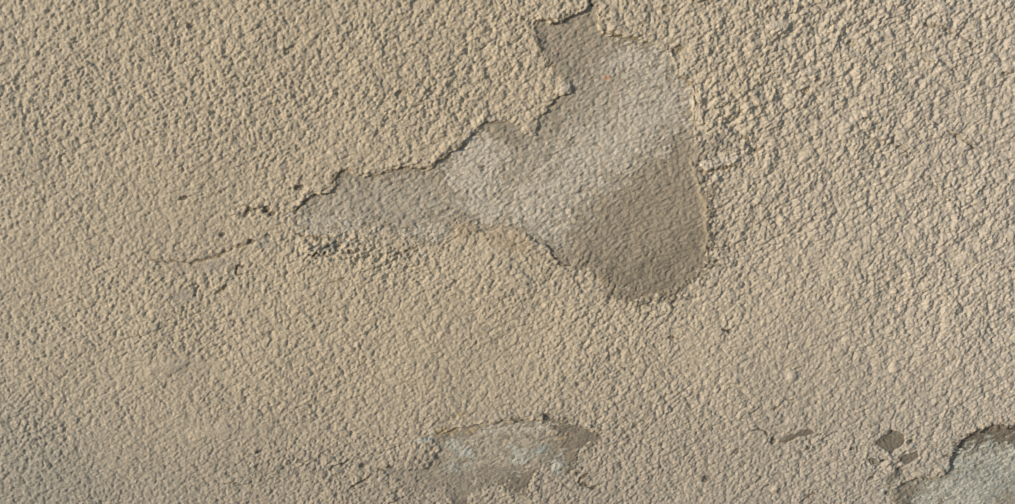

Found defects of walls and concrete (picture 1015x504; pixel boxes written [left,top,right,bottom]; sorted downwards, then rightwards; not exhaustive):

spalling [247,5,744,317]
spalling [394,407,605,504]
spalling [867,415,1015,504]